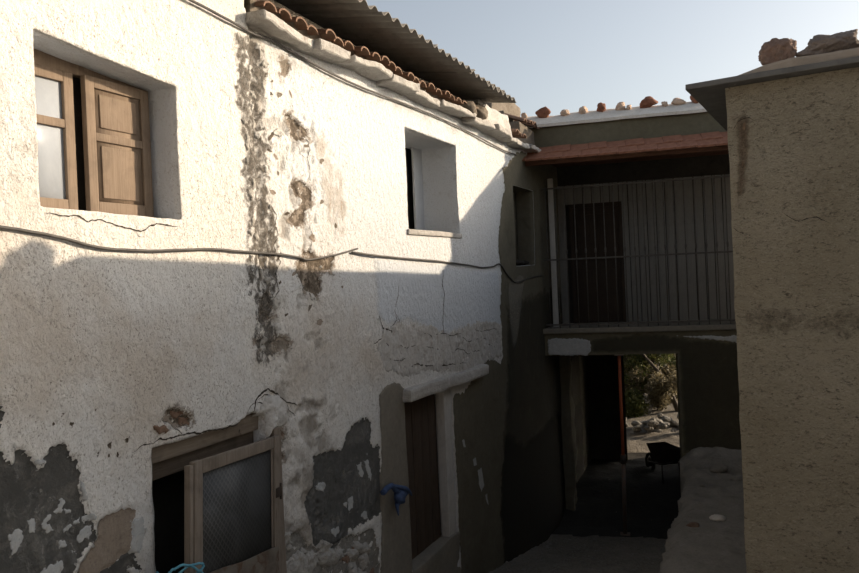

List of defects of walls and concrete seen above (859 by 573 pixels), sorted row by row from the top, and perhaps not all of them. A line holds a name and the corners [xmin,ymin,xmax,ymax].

crack [47,213,178,237]
flaking render [284,178,335,312]
flaking render [253,292,294,355]
crack [374,271,496,367]
flaking render [377,320,502,377]
flaking render [153,404,196,434]
crack [136,388,297,451]
peeling [0,443,147,573]
peeling [284,417,381,573]